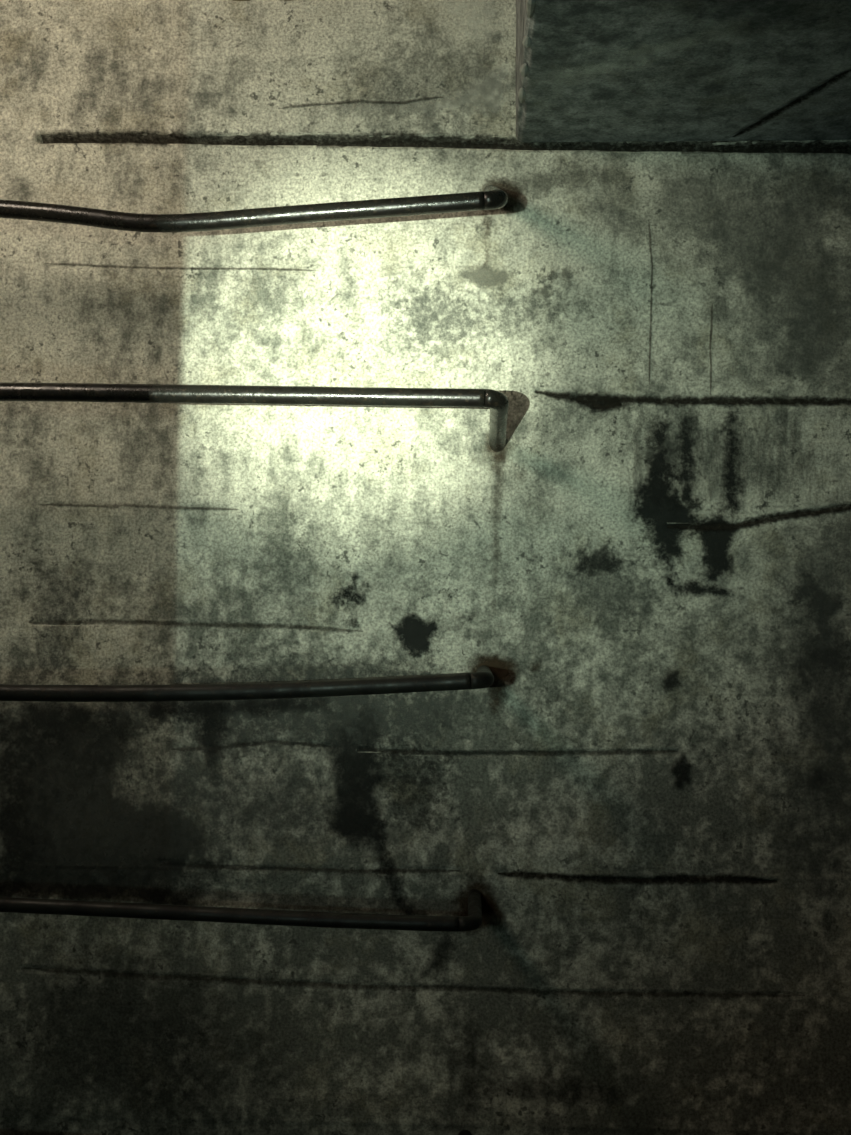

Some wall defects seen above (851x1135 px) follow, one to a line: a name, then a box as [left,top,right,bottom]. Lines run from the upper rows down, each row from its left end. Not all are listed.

crack [535,226,851,411]
leakage [633,413,742,596]
crack [667,504,851,532]
leakage [332,575,369,605]
crack [32,620,352,631]
leakage [169,614,442,684]
leakage [42,690,474,915]
crack [498,871,777,885]